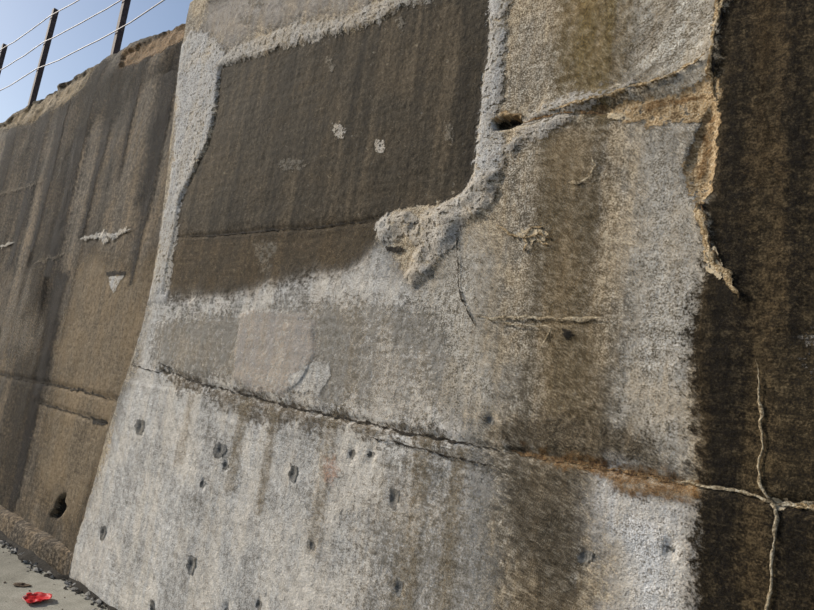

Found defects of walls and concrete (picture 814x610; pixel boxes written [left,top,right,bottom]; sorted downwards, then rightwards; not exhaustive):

leakage [0,35,183,512]
peeling [69,0,518,610]
crack [456,235,478,332]
spalling [491,110,523,130]
leakage [533,126,599,437]
crack [524,0,727,123]
peeling [575,0,727,610]
leakage [684,0,814,610]
crack [132,359,814,610]
leakage [506,439,583,610]